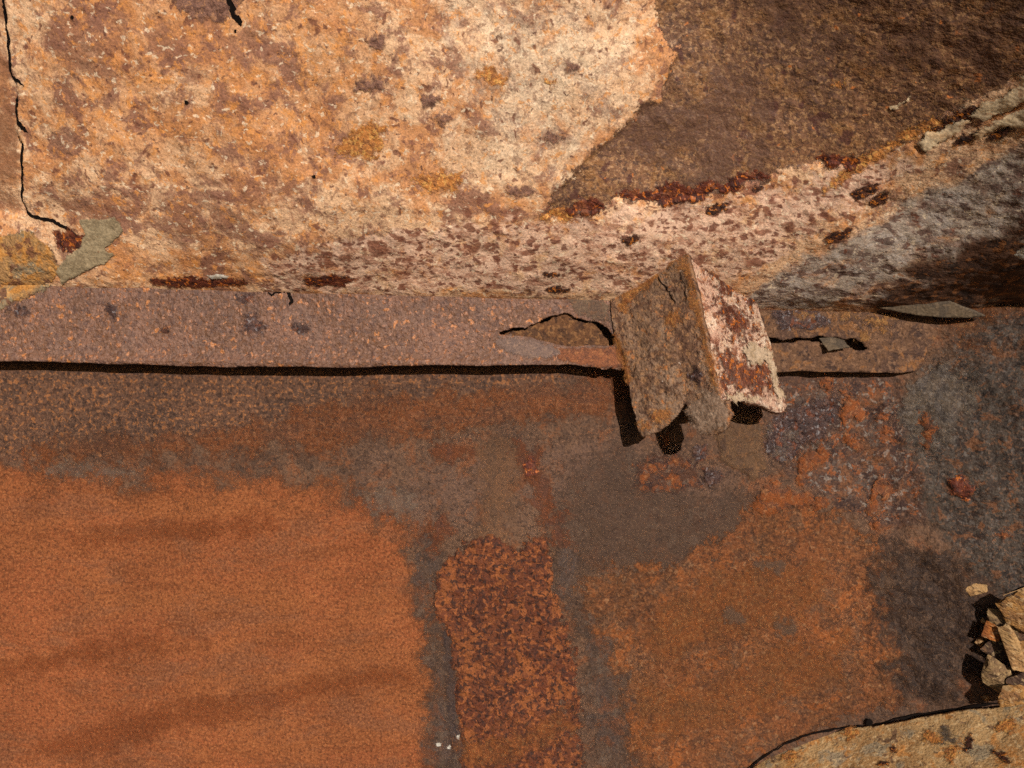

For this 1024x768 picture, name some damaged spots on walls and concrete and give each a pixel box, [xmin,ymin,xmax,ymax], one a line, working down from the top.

crack [2,0,76,236]
peeling [546,0,1024,220]
rust [539,169,772,222]
peeling [0,217,123,309]
rust [150,275,268,337]
rust [302,274,356,287]
rust [0,444,912,768]
crack [749,703,998,768]